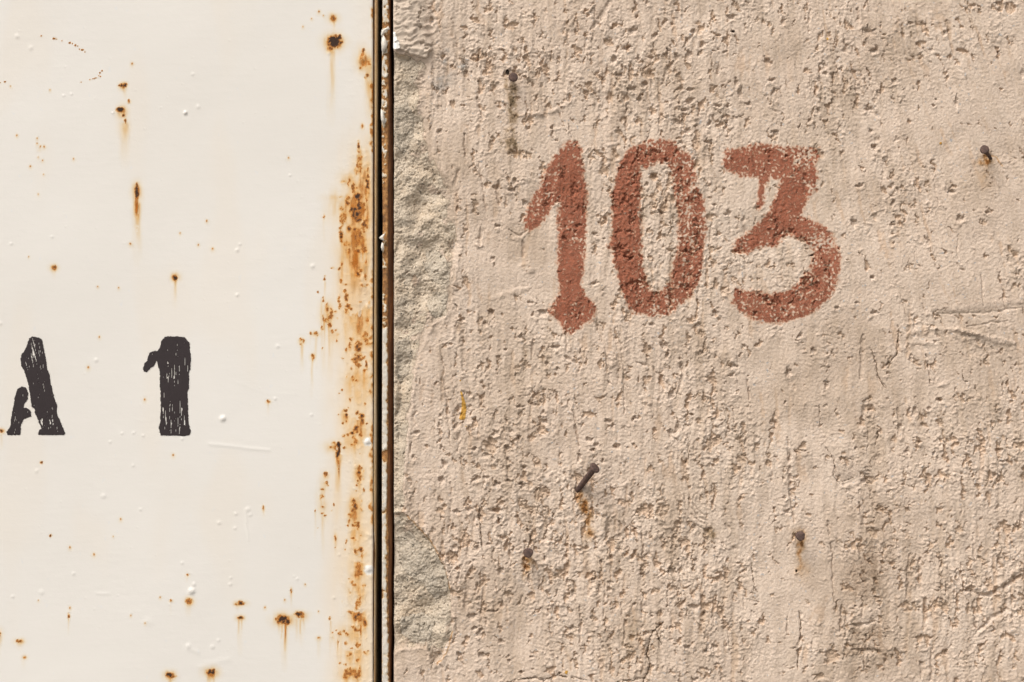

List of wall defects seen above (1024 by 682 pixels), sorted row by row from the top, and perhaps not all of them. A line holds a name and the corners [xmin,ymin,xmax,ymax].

rust [327,34,343,50]
rust [275,611,304,635]
rust [299,114,373,679]
flaking render [379,0,456,682]